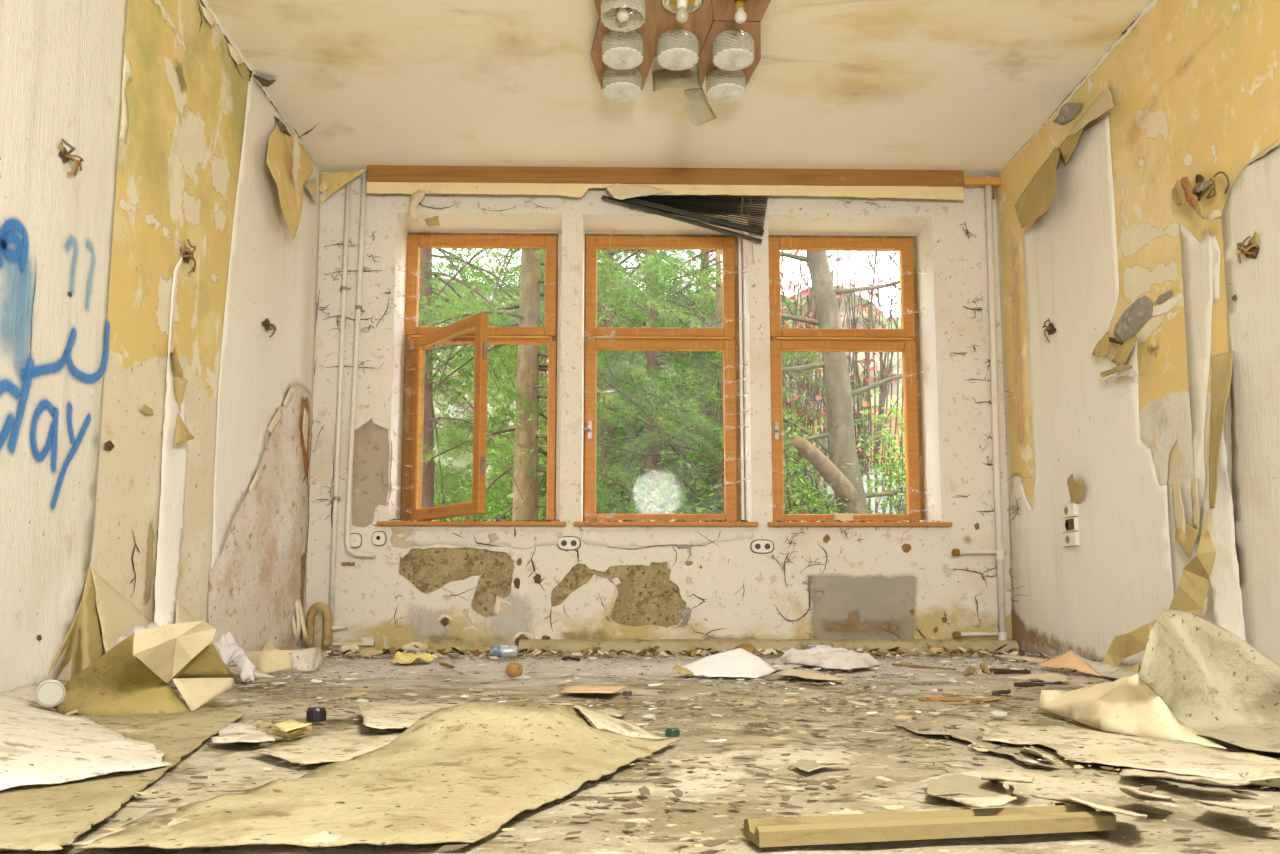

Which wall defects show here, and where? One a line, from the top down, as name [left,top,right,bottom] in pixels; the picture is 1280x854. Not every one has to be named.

peeling [93,0,311,664]
flaking render [352,417,754,636]
peeling [998,0,1280,536]